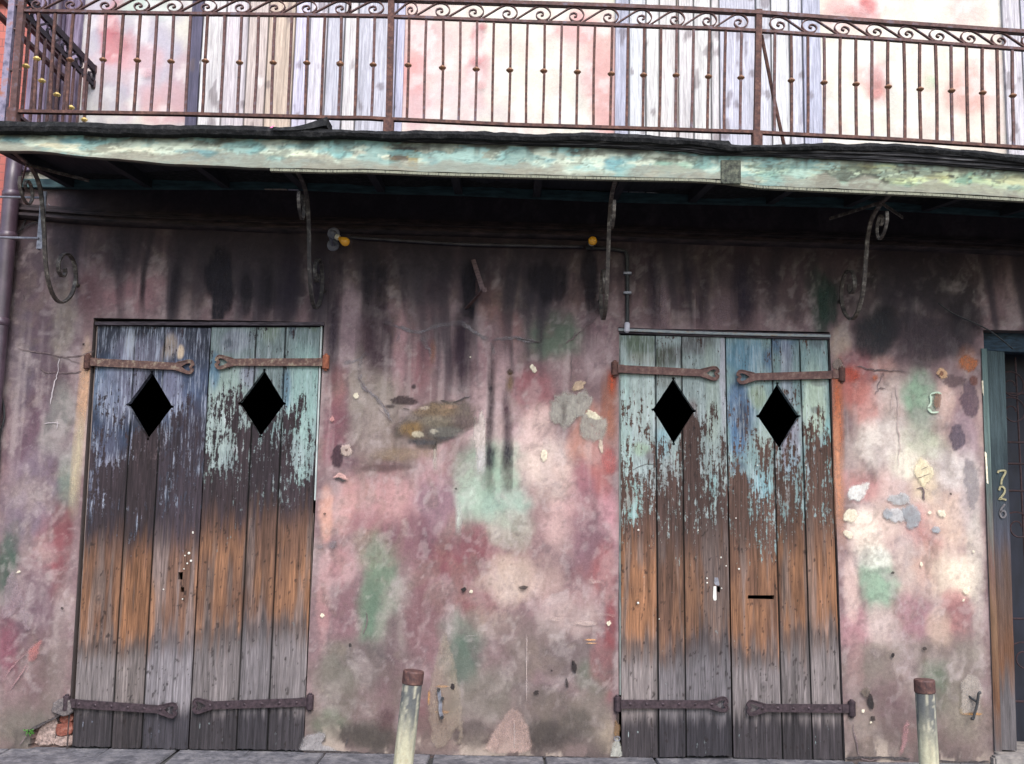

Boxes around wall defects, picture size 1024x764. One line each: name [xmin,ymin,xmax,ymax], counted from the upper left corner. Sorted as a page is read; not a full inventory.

leakage [205,247,251,319]
leakage [463,264,476,315]
peeling [550,381,607,453]
crack [858,366,903,466]
peeling [844,483,869,539]
peeling [883,493,946,533]